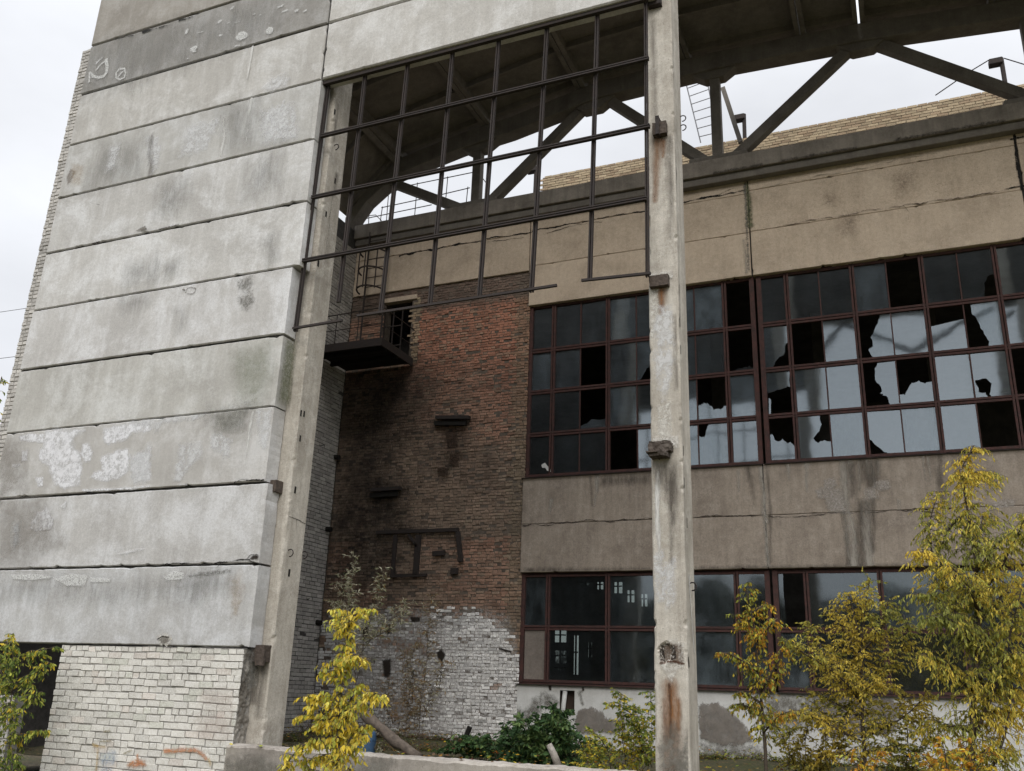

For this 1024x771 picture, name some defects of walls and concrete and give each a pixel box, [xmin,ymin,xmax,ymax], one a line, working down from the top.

crack [677,152,935,206]
crack [752,135,1024,231]
crack [399,211,645,257]
peeling [12,414,201,491]
water stain [840,459,879,566]
spalling [660,639,690,681]
rust [664,683,680,770]
flaking render [698,702,752,746]
flaking render [817,696,903,740]